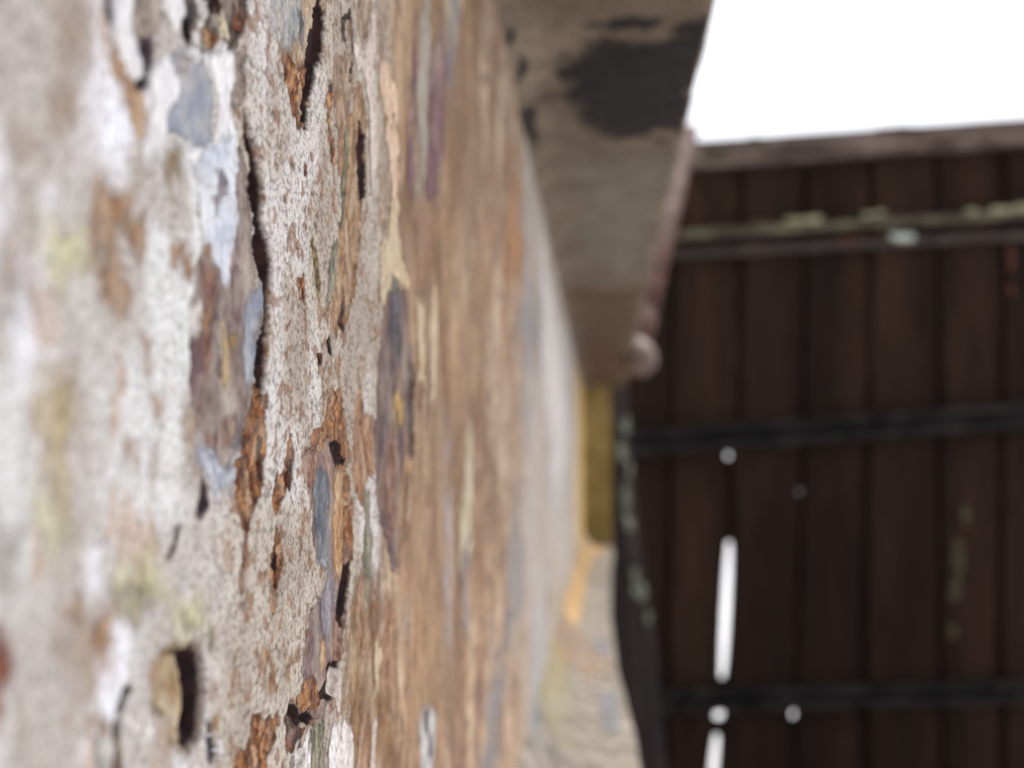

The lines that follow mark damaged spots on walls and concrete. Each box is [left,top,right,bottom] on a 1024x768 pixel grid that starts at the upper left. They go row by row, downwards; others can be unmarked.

crack [231,0,246,33]
crack [243,121,269,403]
peeling [103,0,459,768]